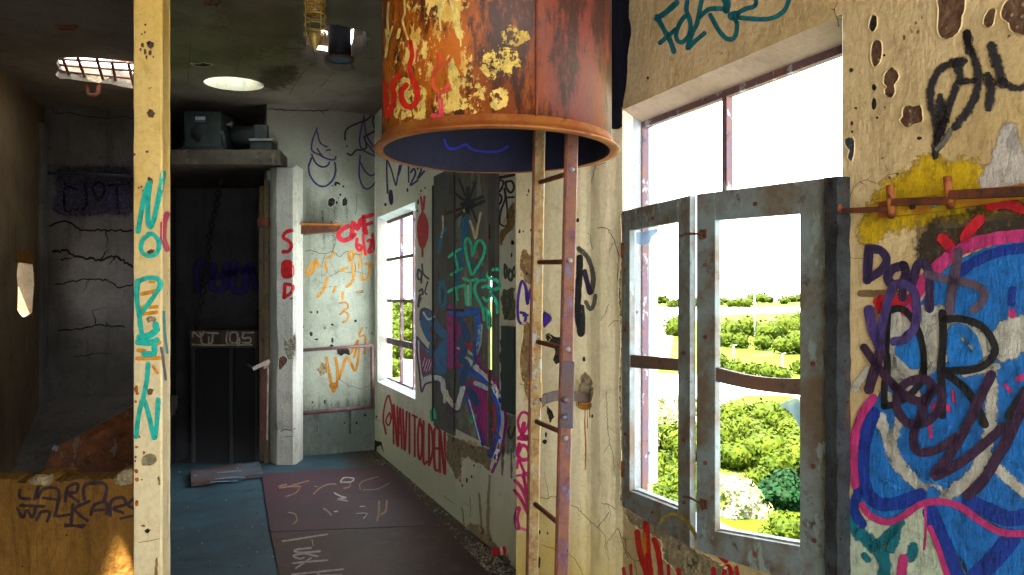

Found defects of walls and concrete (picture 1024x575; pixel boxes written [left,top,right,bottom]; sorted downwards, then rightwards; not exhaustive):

spalling [936,0,966,40]
spalling [983,0,1024,36]
spalling [868,14,900,119]
spalling [899,104,924,140]
peeling [648,128,658,205]
crack [49,220,133,331]
peeling [617,226,741,575]
peeling [444,434,492,487]
rust [576,402,592,470]